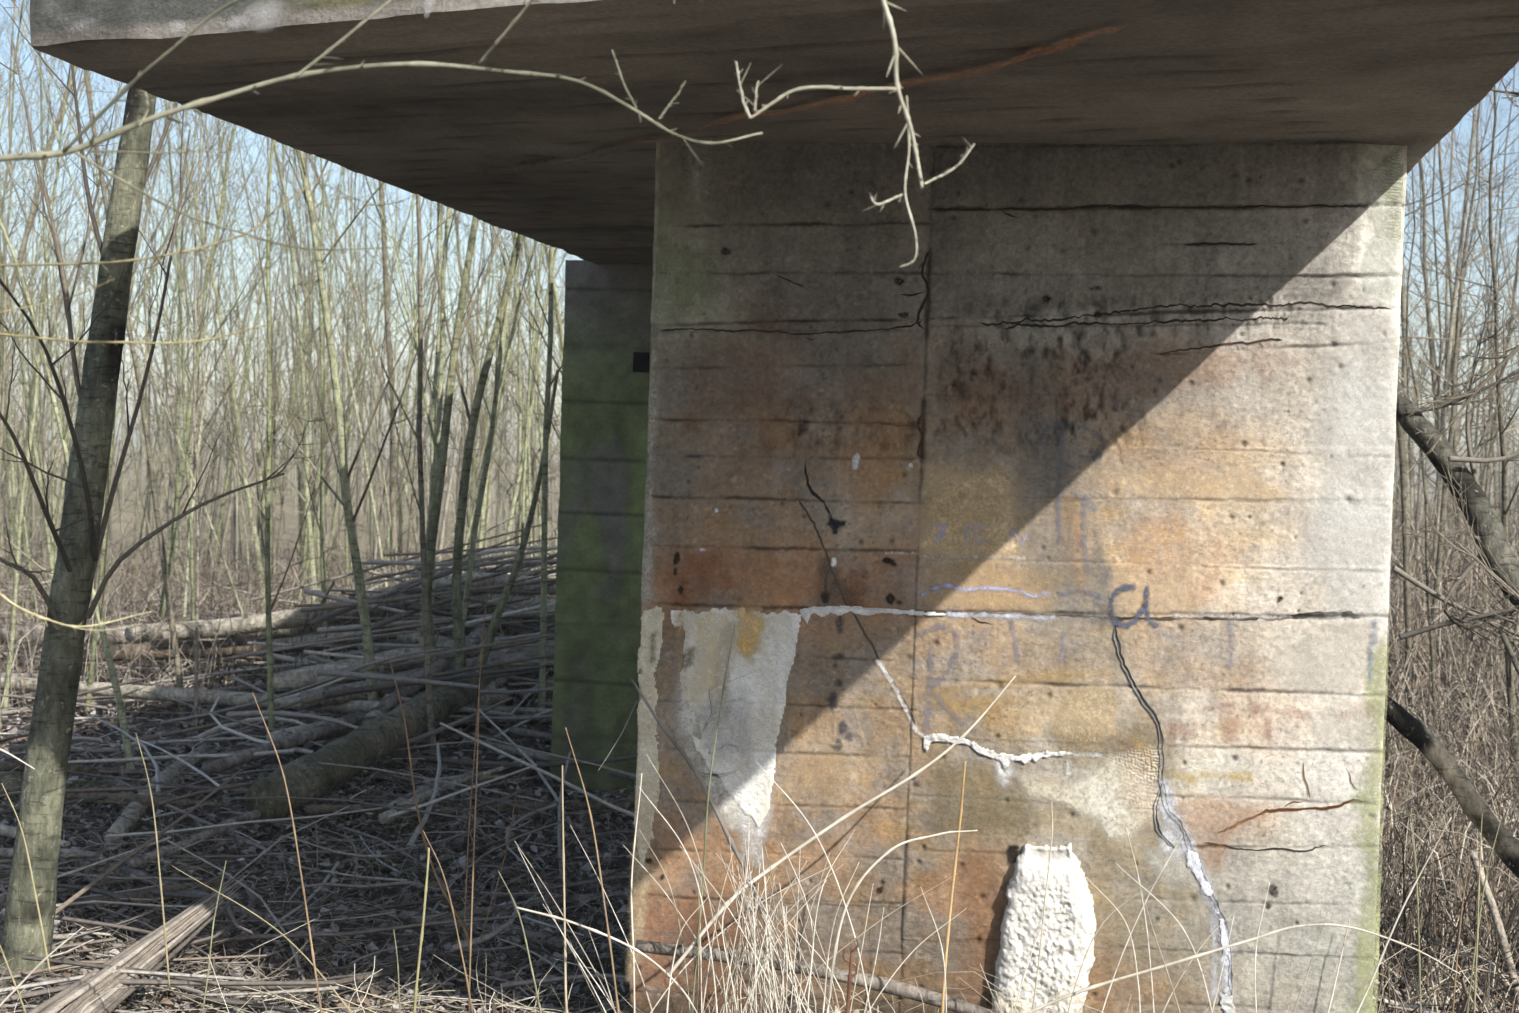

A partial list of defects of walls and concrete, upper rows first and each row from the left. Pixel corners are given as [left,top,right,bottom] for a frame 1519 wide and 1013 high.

crack [659,251,930,340]
crack [937,204,1366,246]
crack [978,301,1389,355]
damp [629,350,1077,978]
crack [798,462,915,725]
damp [1087,546,1287,621]
damp [1275,322,1395,688]
damp [876,659,1236,1013]
crack [924,610,1366,992]